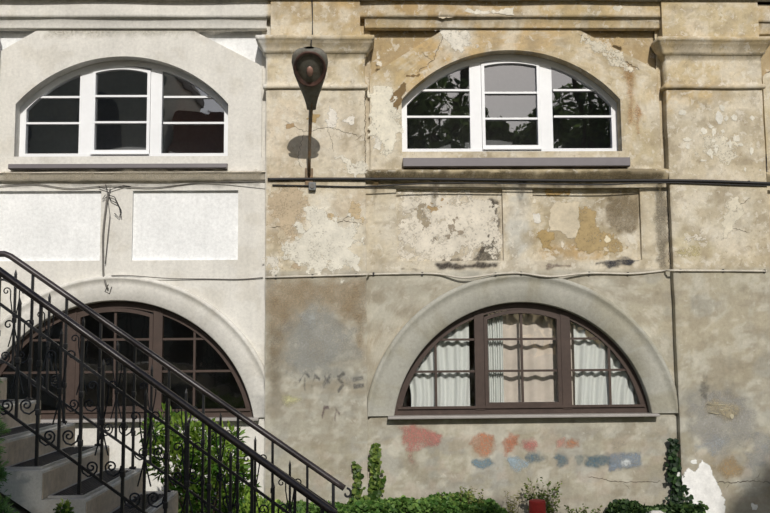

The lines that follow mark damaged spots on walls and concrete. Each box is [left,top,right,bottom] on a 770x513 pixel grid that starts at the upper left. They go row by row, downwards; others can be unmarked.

peeling [580,35,638,72]
peeling [306,107,355,128]
crack [295,96,366,176]
peeling [334,155,369,178]
flaking render [365,74,420,156]
peeling [682,105,754,165]
peeling [262,183,366,284]
peeling [397,189,503,261]
flaking render [533,189,630,255]
peeling [677,459,725,513]